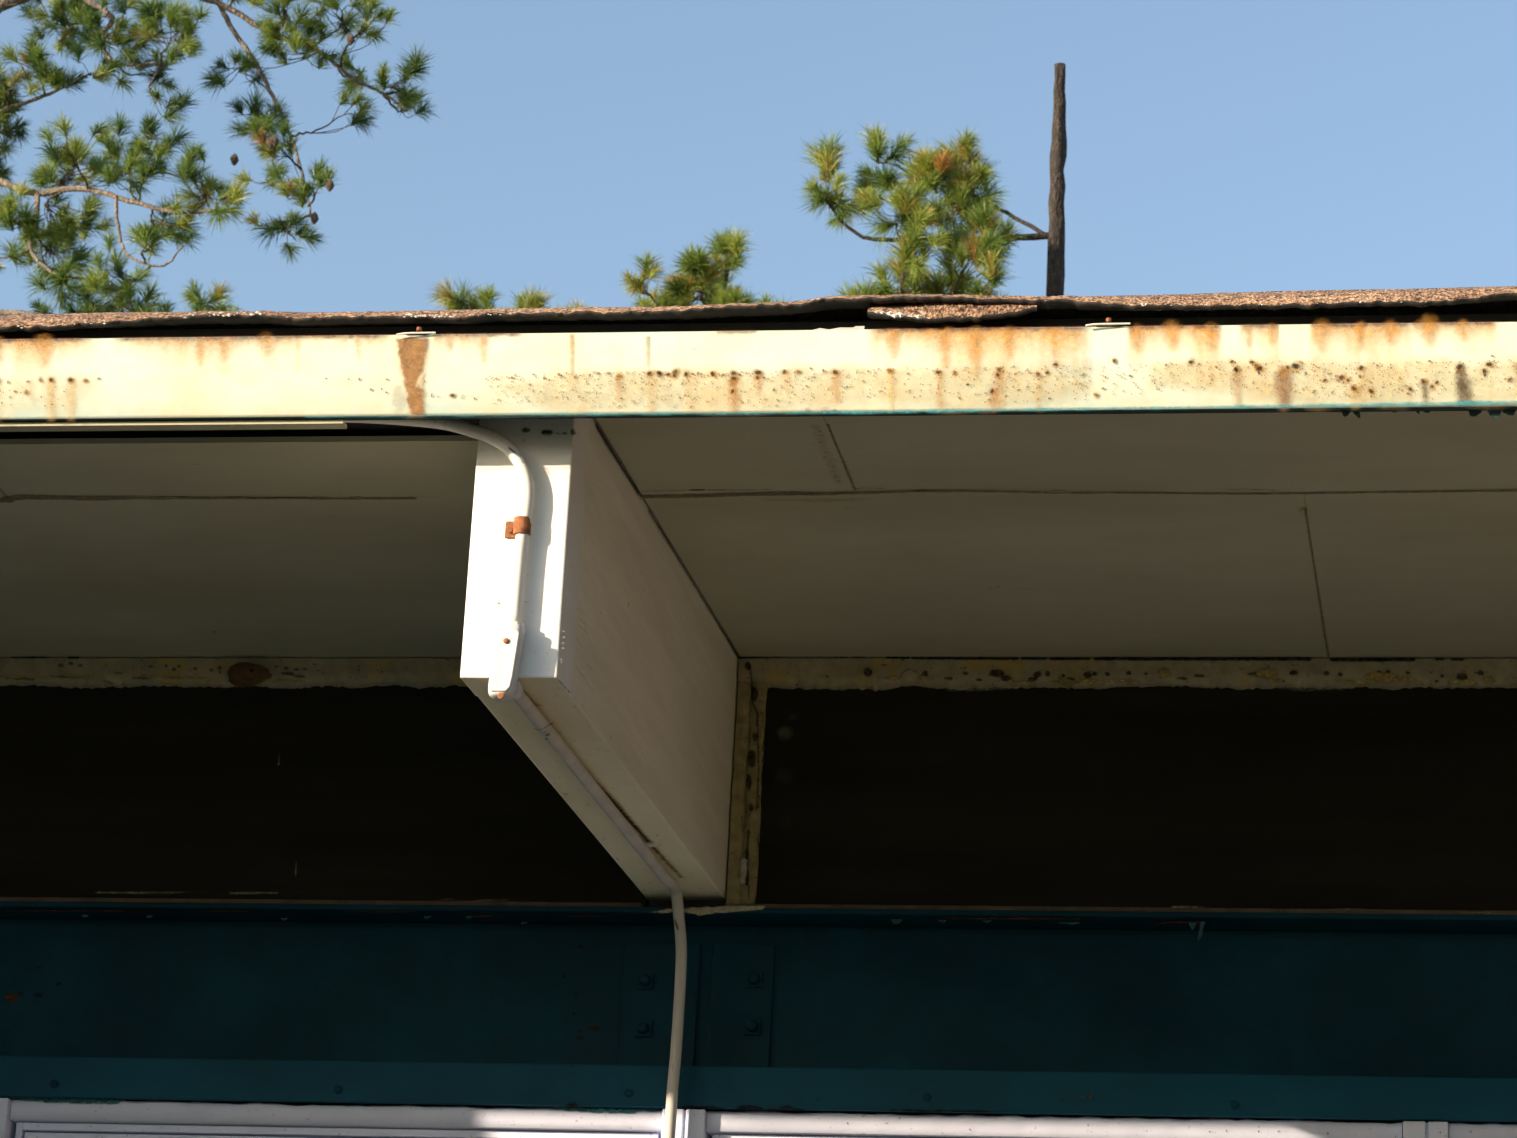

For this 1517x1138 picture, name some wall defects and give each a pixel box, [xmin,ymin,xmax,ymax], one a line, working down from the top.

rust [0,338,81,351]
rust [123,332,518,416]
rust [461,368,894,408]
spalling [647,370,775,393]
peeling [787,368,1104,414]
rust [875,324,1517,408]
peeling [1114,364,1517,419]
rust [1312,321,1493,337]